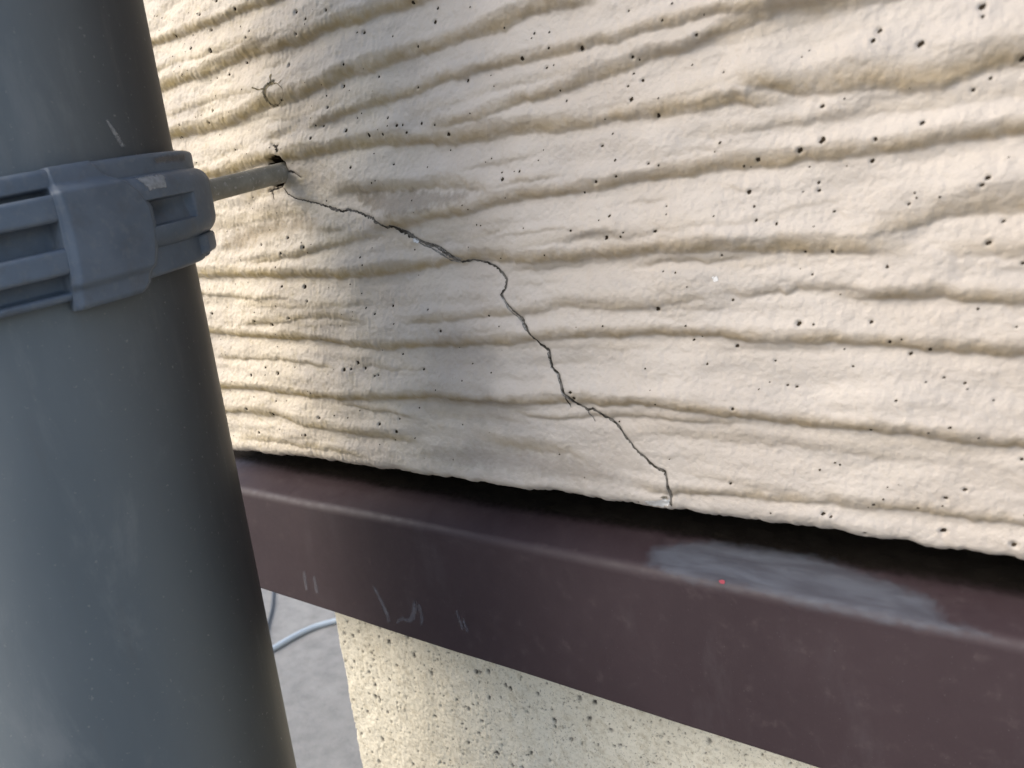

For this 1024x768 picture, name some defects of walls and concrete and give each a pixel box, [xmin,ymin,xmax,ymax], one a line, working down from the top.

crack [283,187,672,506]